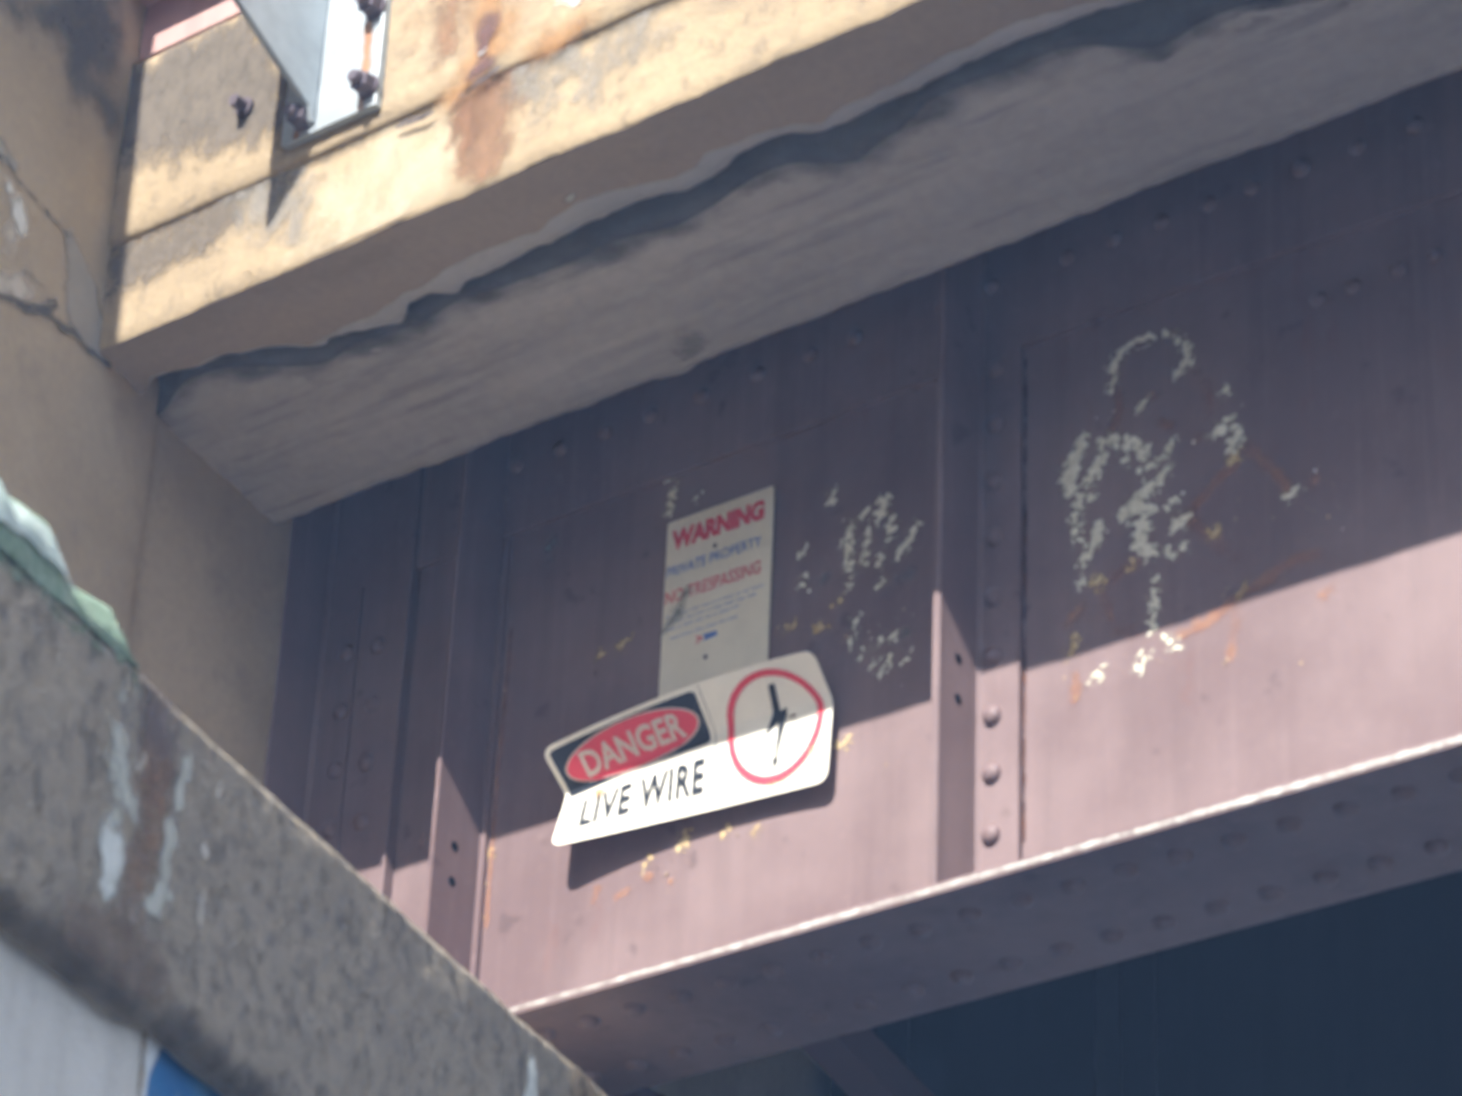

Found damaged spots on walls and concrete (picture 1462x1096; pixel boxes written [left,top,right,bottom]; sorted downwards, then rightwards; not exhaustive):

corrosion [453,0,514,183]
spalling [140,0,1255,415]
crack [0,273,111,367]